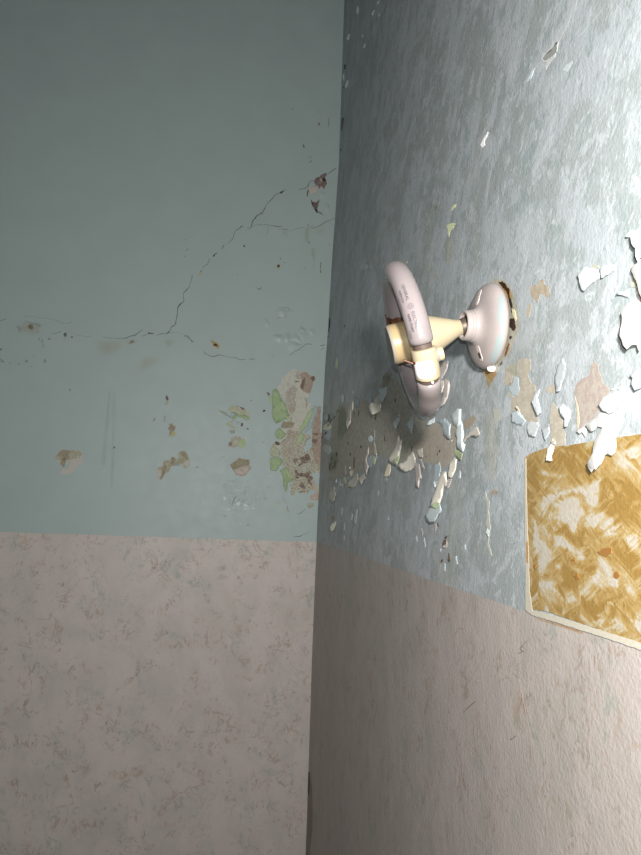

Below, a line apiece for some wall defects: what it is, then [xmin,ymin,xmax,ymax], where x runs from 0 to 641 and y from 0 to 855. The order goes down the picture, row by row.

spalling [307,173,330,215]
crack [30,168,336,360]
flaking render [526,279,550,318]
peeling [577,263,616,291]
spalling [616,228,641,351]
peeling [439,361,450,407]
flaking render [504,358,621,472]
peeling [218,400,252,477]
peeling [55,450,83,475]
peeling [157,451,198,480]
peeling [262,369,480,571]